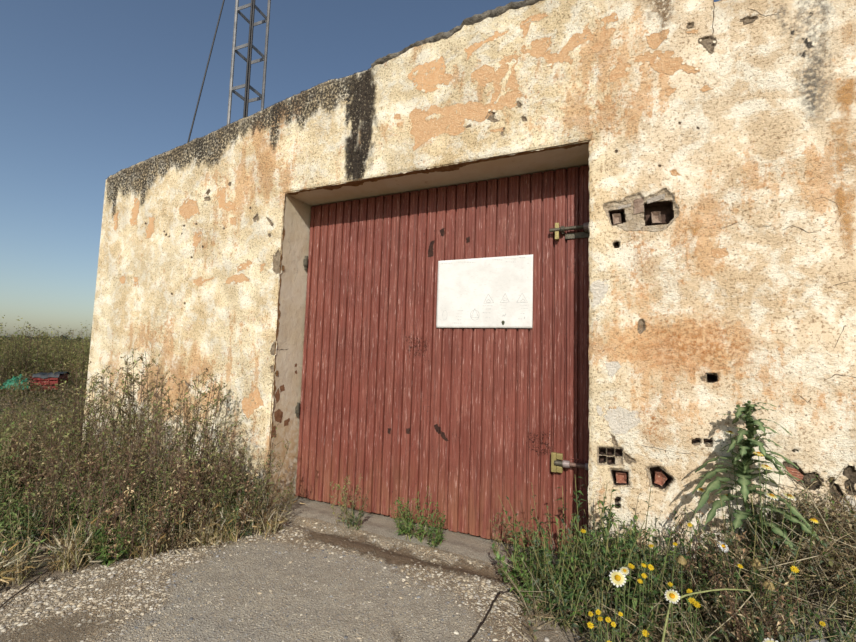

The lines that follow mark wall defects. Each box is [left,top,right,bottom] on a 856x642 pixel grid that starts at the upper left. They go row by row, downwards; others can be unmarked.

peeling [394,12,625,151]
leakage [106,68,376,216]
peeling [129,197,170,239]
peeling [179,182,238,258]
spalling [603,188,679,232]
spalling [226,140,589,459]
spalling [597,434,676,508]
spalling [782,449,856,507]